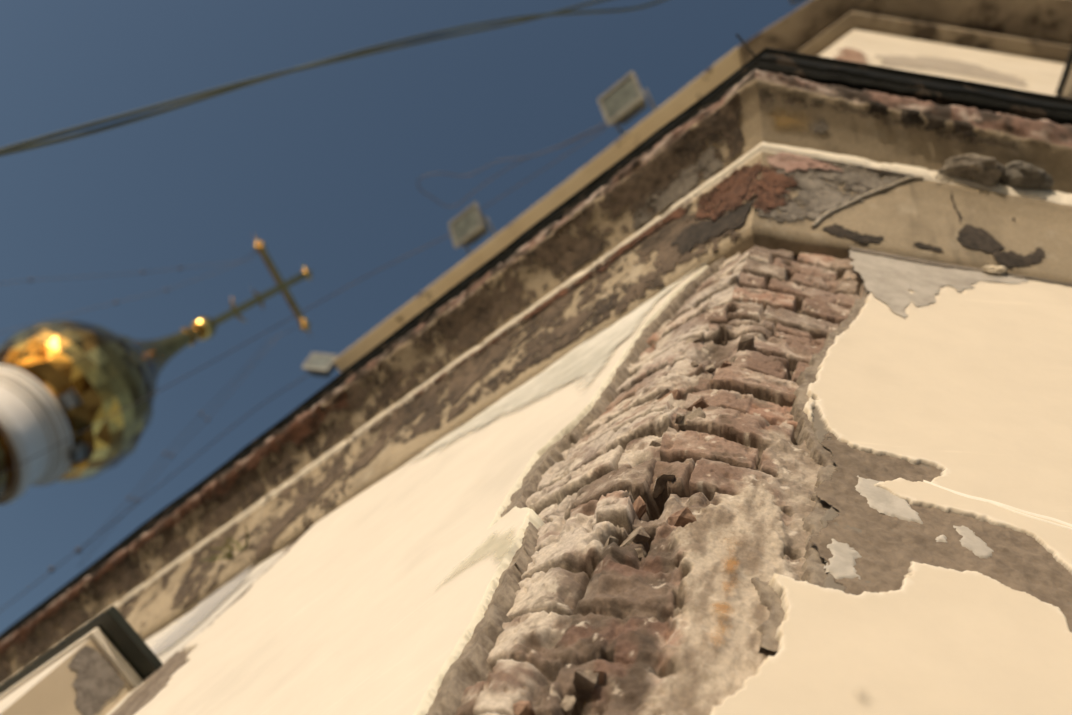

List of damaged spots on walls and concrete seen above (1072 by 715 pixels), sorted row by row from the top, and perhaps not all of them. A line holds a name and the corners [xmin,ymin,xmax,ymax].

spalling [426,223,1072,715]
crack [923,480,1072,530]
peeling [68,646,191,715]